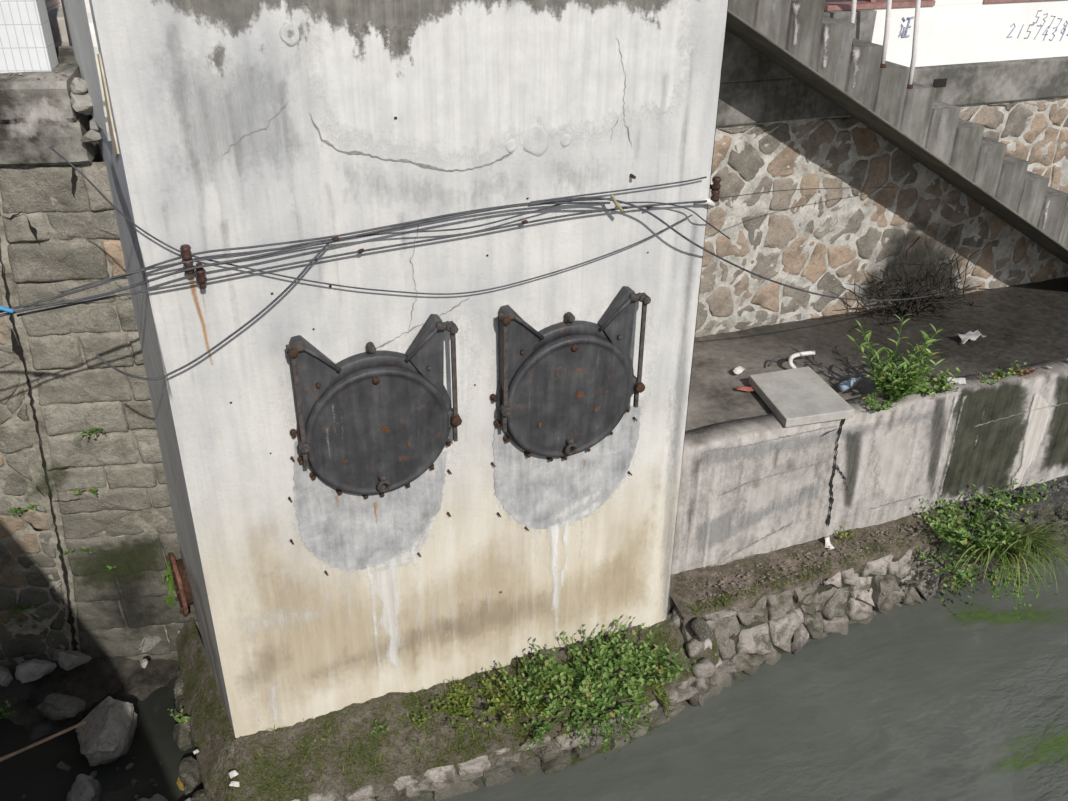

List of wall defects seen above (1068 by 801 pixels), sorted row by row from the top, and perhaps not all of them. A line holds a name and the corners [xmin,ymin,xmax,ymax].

crack [70,164,78,197]
crack [1,211,39,243]
rust [190,279,210,355]
crack [0,260,87,651]
crack [699,419,849,527]
leakage [550,521,569,609]
leakage [367,558,399,667]